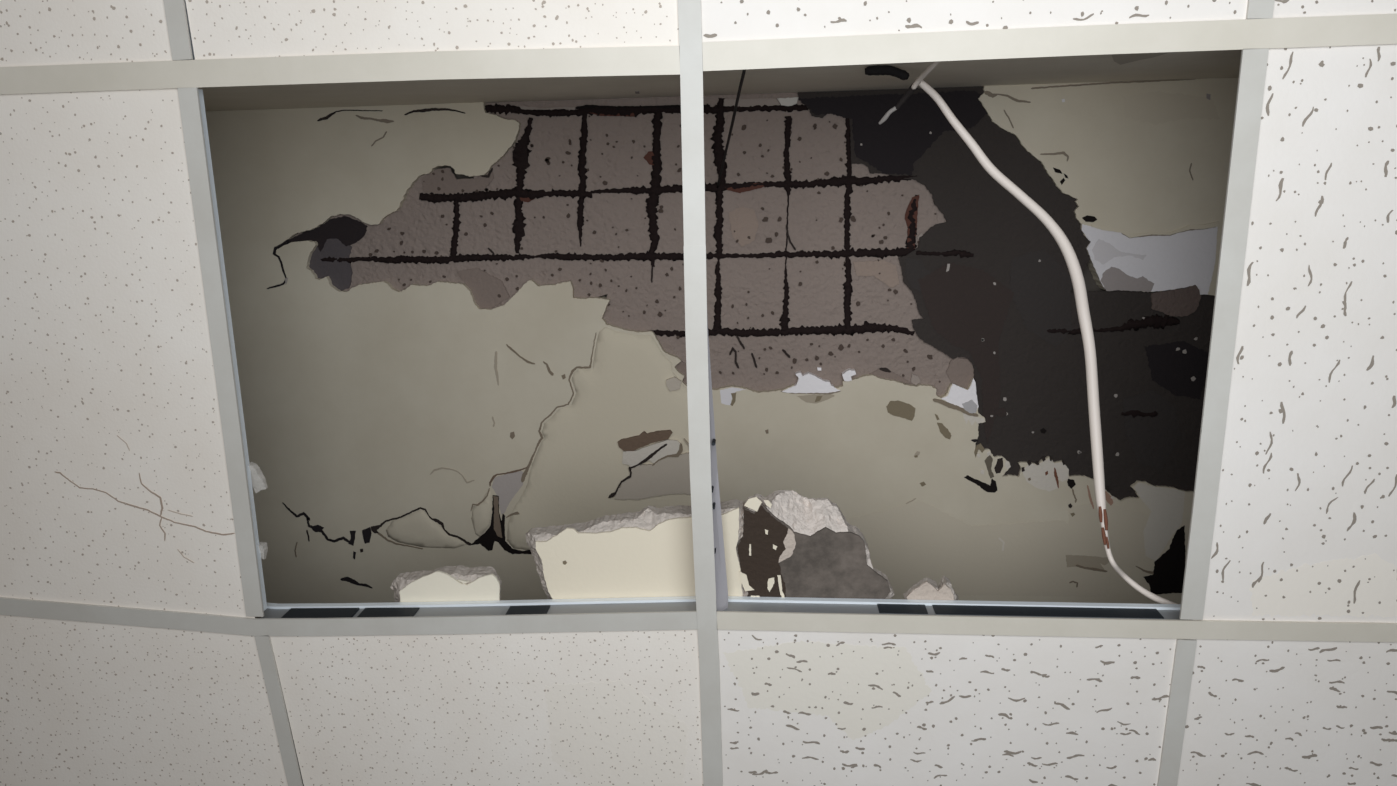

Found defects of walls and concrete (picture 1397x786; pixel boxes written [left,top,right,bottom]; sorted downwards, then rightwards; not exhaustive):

crack [55,435,235,563]
crack [282,333,596,557]
corrosion [320,103,684,267]
spalling [331,96,686,391]
crack [608,438,689,498]
corrosion [648,329,686,338]
corrosion [703,98,974,337]
spalling [703,93,985,439]
leakage [798,90,987,175]
leakage [905,249,1076,493]
flaking render [1134,482,1186,594]
leakage [1122,341,1209,470]